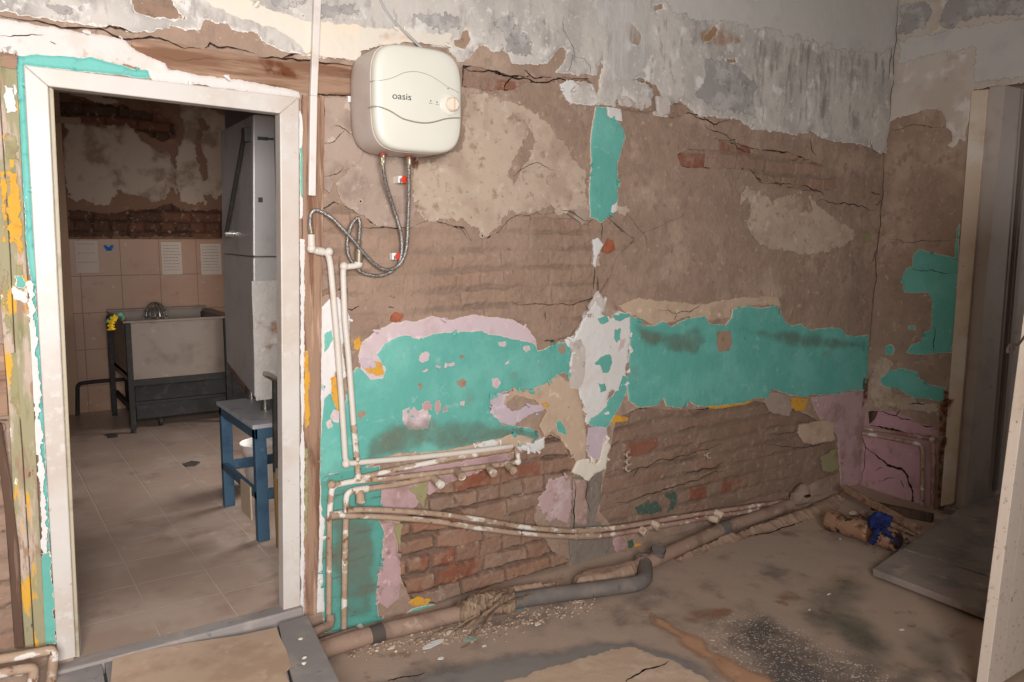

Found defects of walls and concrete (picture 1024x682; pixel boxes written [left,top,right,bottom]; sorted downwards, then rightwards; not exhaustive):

flaking render [0,477,14,647]
peeling [0,0,313,554]
crack [463,18,591,89]
peeling [316,0,1024,633]
crack [686,15,947,337]
crack [860,403,937,502]